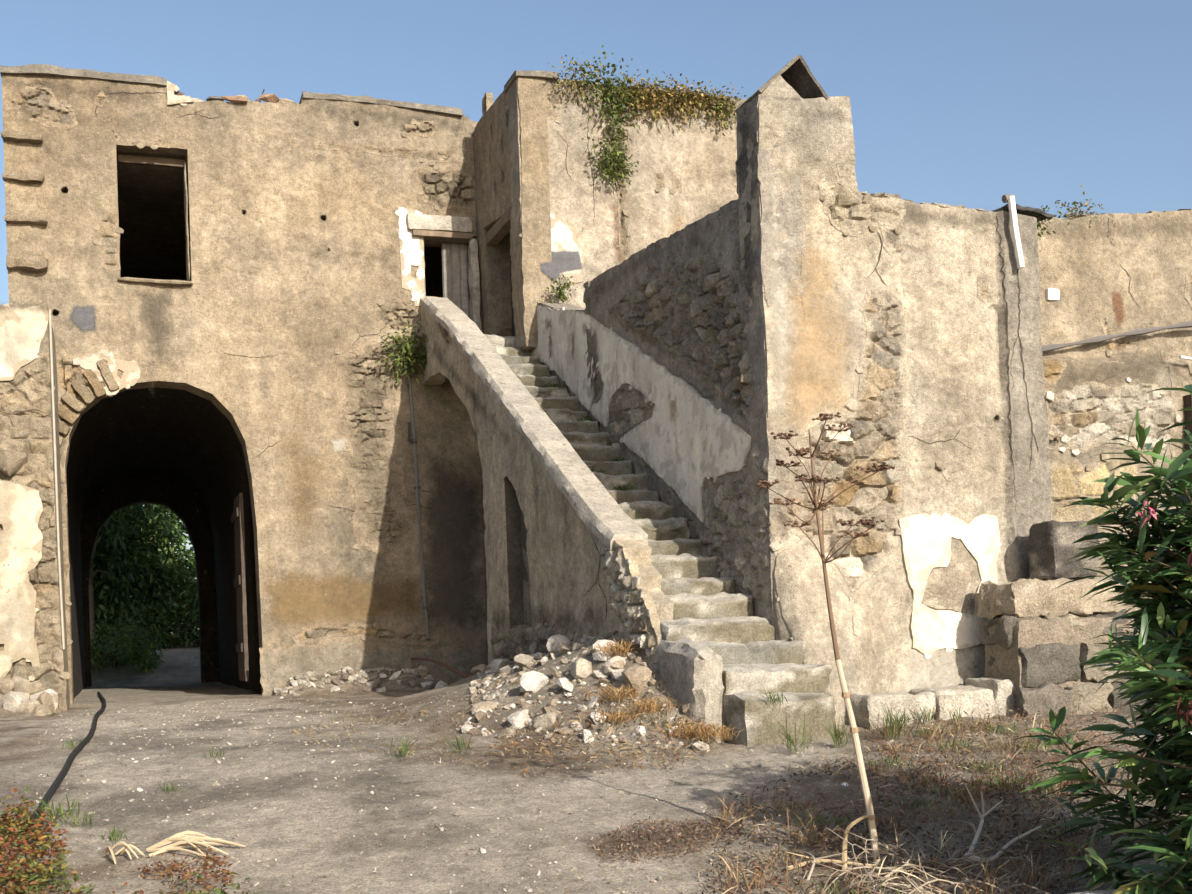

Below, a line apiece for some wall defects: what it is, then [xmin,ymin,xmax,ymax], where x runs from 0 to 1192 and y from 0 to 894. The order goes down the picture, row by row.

flaking render [289,118,475,330]
flaking render [818,175,910,255]
flaking render [0,480,43,681]
flaking render [0,303,49,381]
flaking render [54,348,141,645]
flaking render [333,342,411,555]
flaking render [532,253,1002,662]
crack [996,216,1039,510]
flaking render [1042,355,1182,522]